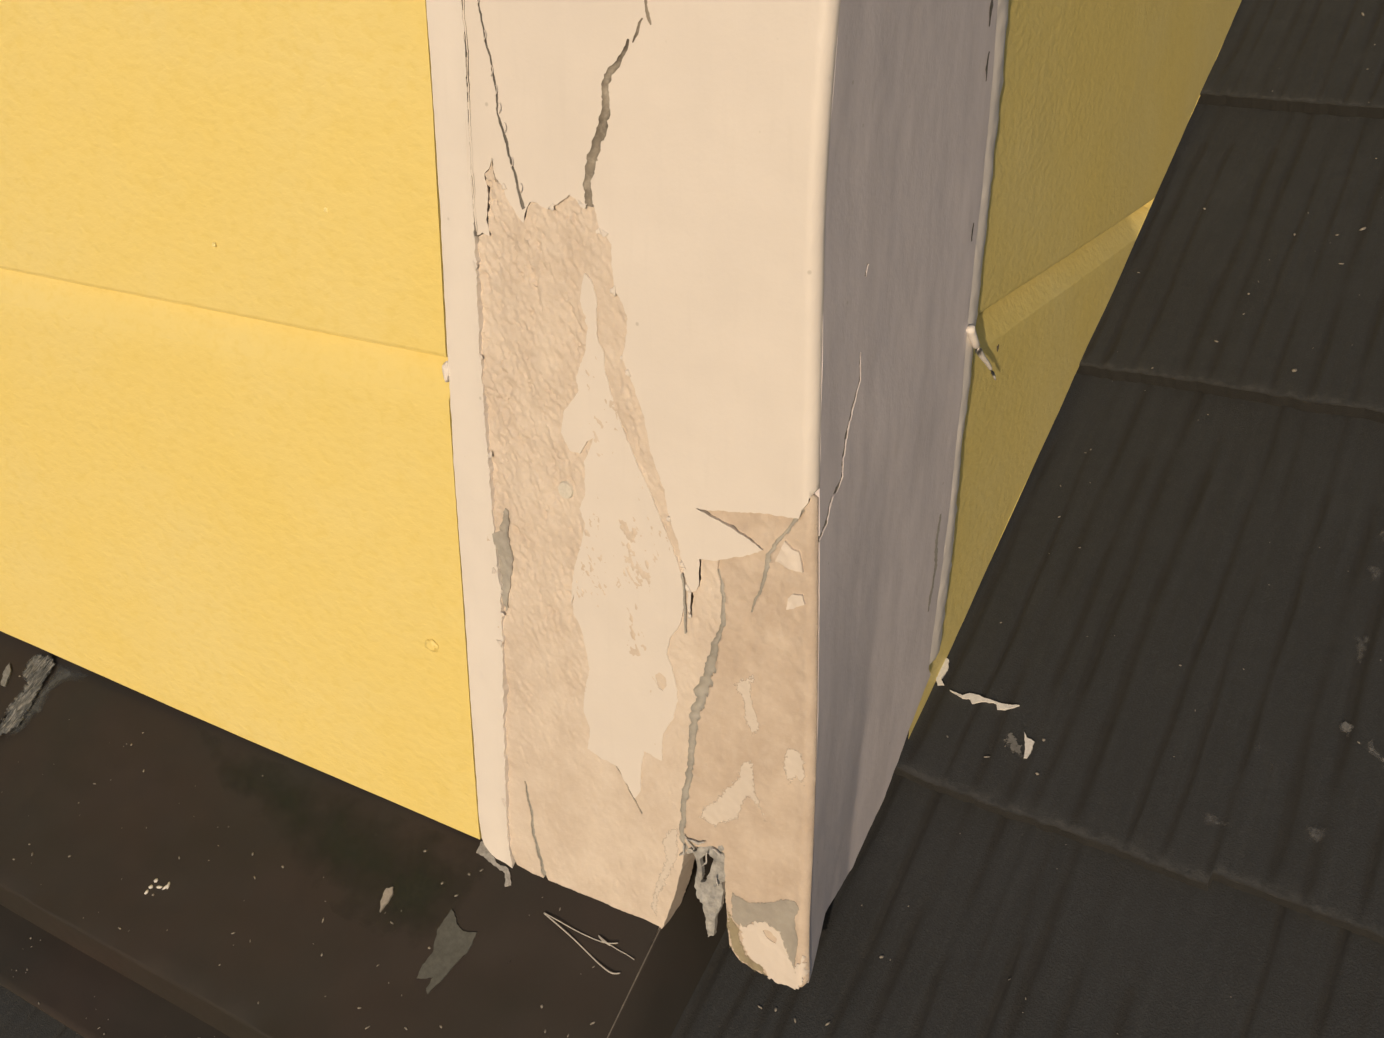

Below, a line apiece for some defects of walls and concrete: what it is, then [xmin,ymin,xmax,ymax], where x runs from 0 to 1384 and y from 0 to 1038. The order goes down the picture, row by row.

crack [462,0,525,236]
crack [583,0,652,207]
flaking render [473,160,818,990]